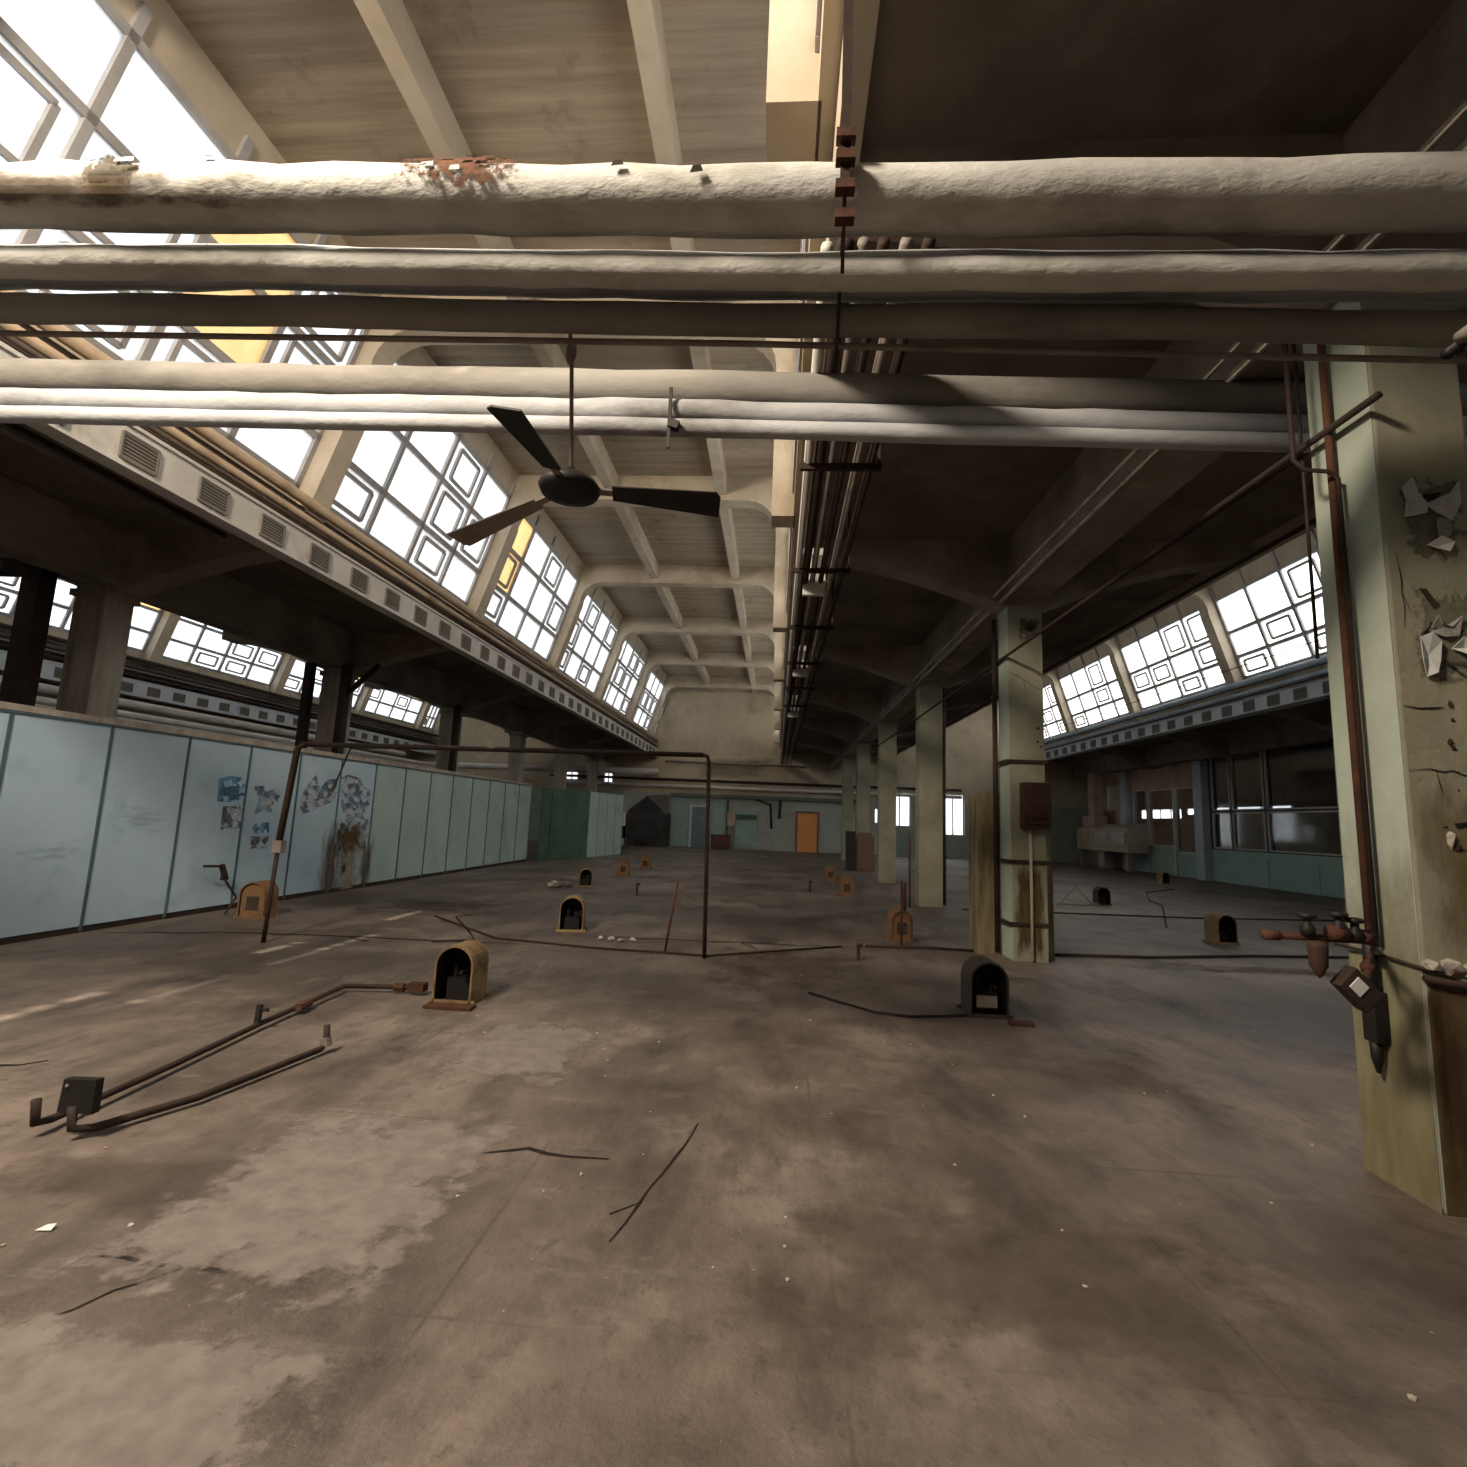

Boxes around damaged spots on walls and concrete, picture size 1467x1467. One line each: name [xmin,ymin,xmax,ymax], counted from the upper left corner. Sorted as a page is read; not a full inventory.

rust [0,171,220,207]
rust [399,156,515,188]
peeling [1399,477,1466,560]
peeling [1413,588,1467,685]
spalling [1447,700,1457,751]
rust [321,820,370,892]
crack [0,1059,48,1067]
crack [482,1147,609,1159]
crack [609,1123,698,1242]